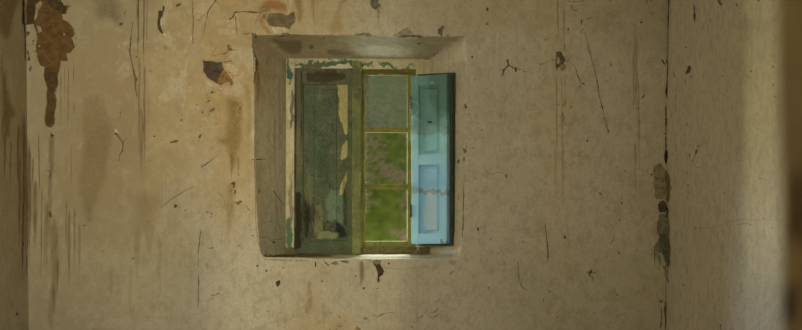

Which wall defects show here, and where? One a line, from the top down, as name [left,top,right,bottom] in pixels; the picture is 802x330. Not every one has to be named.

flaking render [265,11,303,38]
flaking render [25,0,77,137]
flaking render [196,58,238,115]
crack [502,29,609,134]
flaking render [554,49,570,72]
flaking render [651,162,681,269]
flaking render [369,259,395,289]